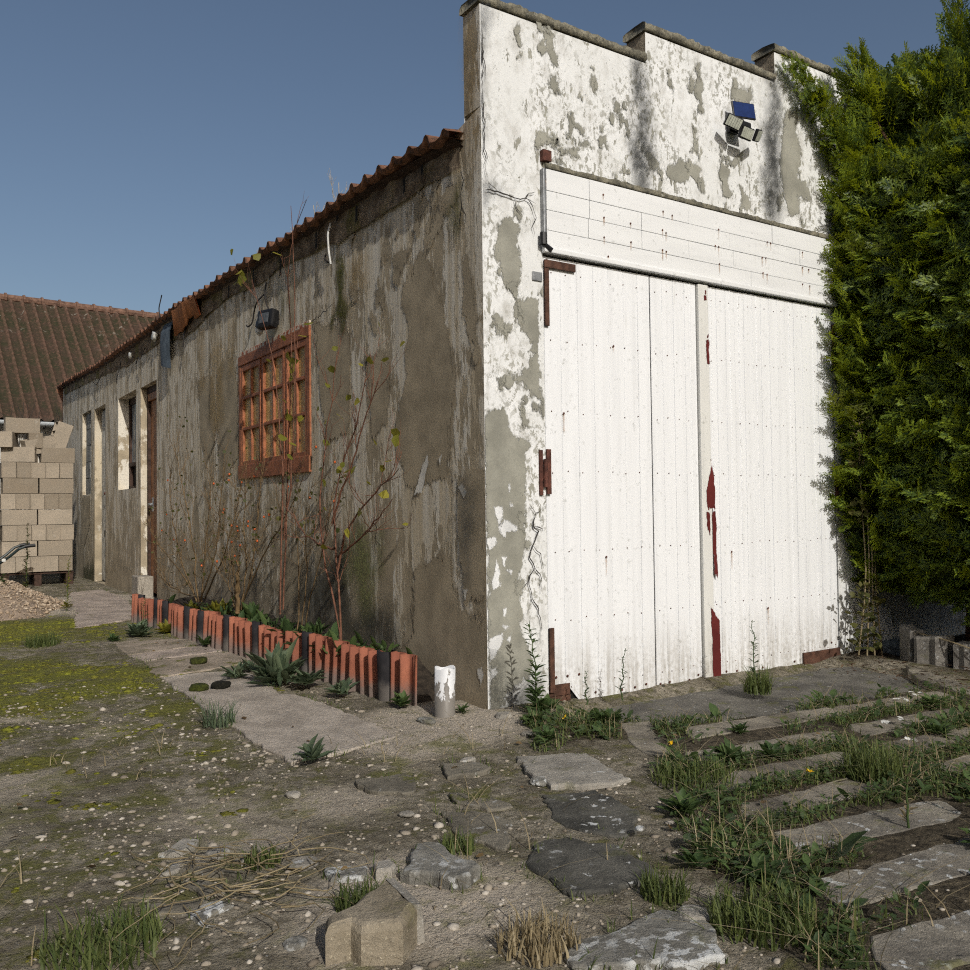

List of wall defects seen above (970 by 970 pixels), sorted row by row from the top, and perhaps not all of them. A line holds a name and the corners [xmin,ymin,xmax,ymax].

peeling [514,24,523,59]
peeling [536,21,563,94]
peeling [577,65,598,100]
peeling [687,62,705,114]
peeling [534,97,631,166]
water stain [635,99,652,188]
peeling [641,123,706,193]
peeling [716,144,757,213]
water stain [768,83,781,219]
peeling [64,143,545,709]
crack [525,505,543,639]